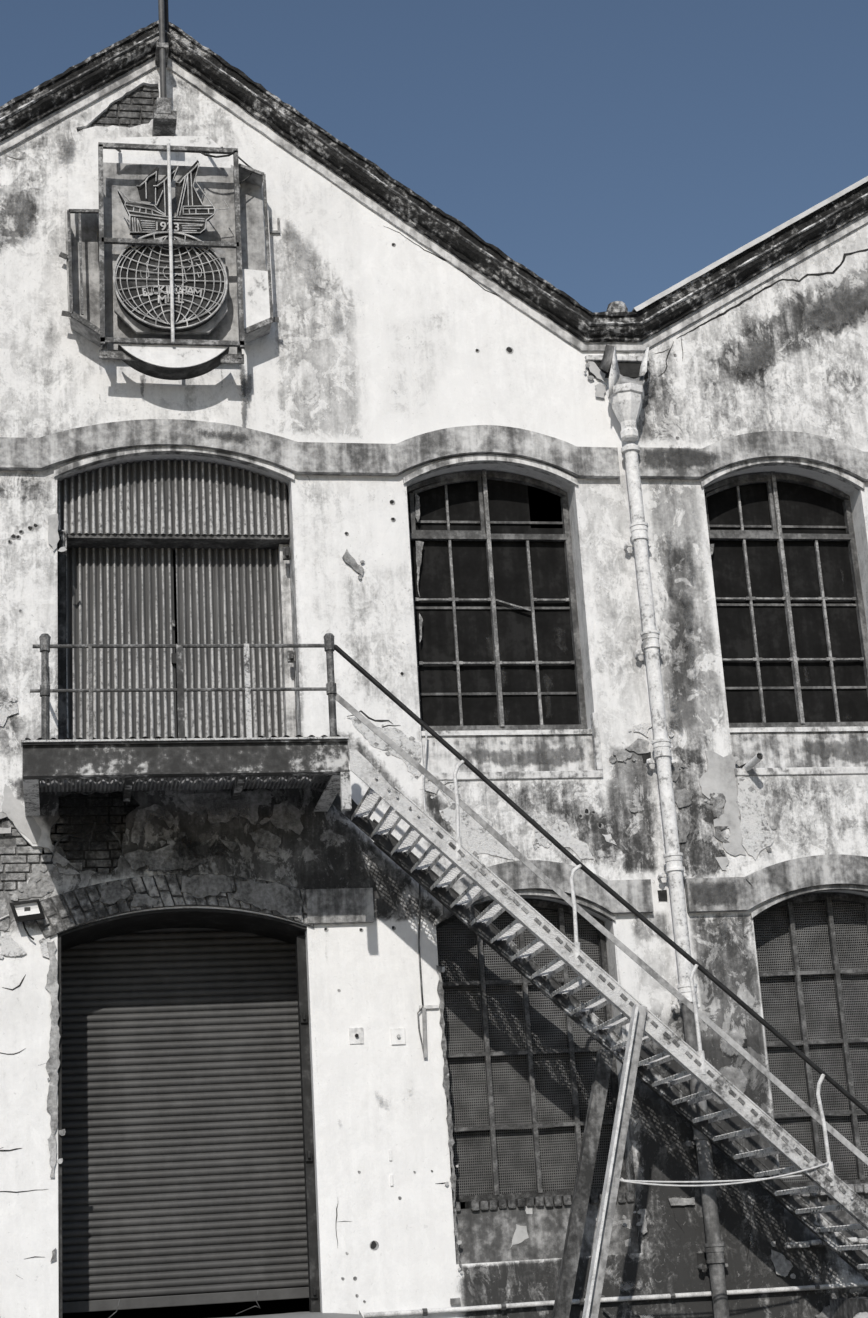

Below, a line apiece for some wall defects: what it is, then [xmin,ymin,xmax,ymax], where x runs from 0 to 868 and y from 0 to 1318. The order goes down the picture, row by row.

damp [58,140,75,159]
crack [656,249,868,377]
damp [804,282,868,331]
damp [644,446,716,469]
damp [667,537,698,686]
damp [669,691,683,732]
flaking render [0,784,328,1178]